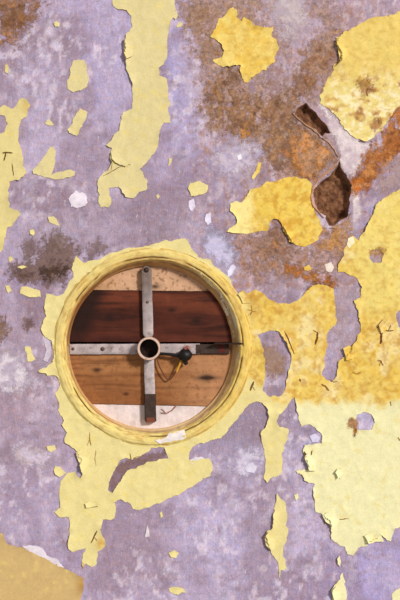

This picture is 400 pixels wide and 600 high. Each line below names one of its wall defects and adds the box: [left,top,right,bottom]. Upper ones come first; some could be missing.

corrosion [0,0,46,52]
peeling [97,0,176,207]
peeling [210,7,279,83]
corrosion [176,0,343,184]
corrosion [357,76,375,93]
peeling [0,98,30,252]
peeling [227,103,352,247]
corrosion [349,107,400,197]
water stain [7,228,109,290]
corrosion [222,219,354,290]
peeling [38,189,400,578]
peeling [331,573,347,600]